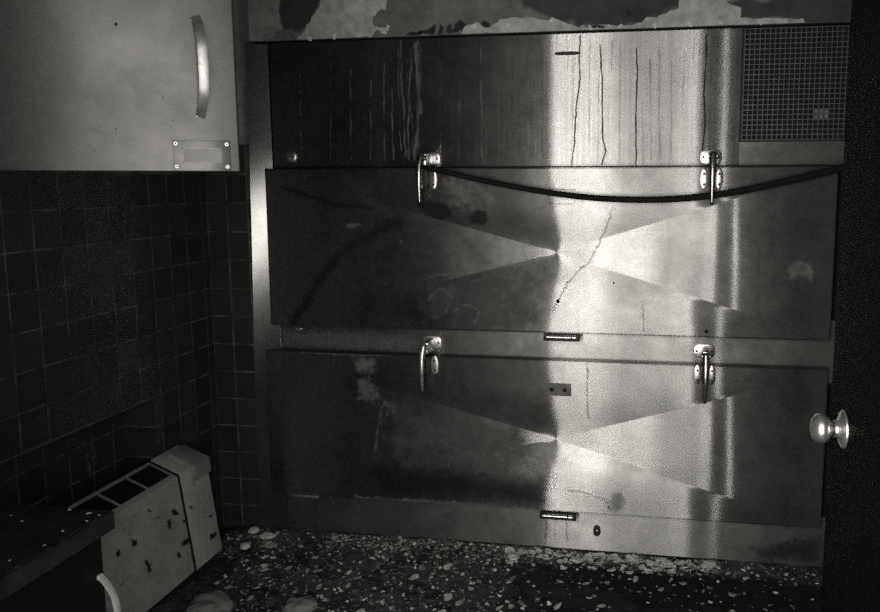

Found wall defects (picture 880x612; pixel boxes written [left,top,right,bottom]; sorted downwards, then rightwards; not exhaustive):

peeling [248,0,283,41]
peeling [297,0,390,41]
peeling [462,0,804,34]